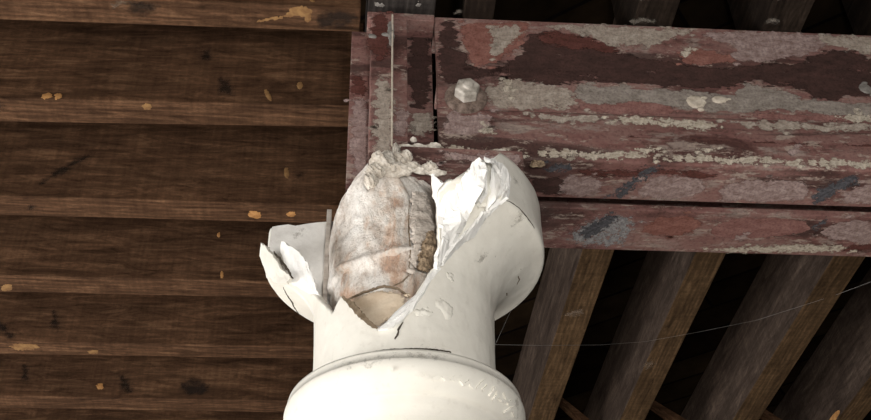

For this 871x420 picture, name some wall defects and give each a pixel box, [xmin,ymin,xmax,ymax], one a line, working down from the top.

peeling [344,20,871,176]
spalling [260,241,320,295]
spalling [353,144,871,331]